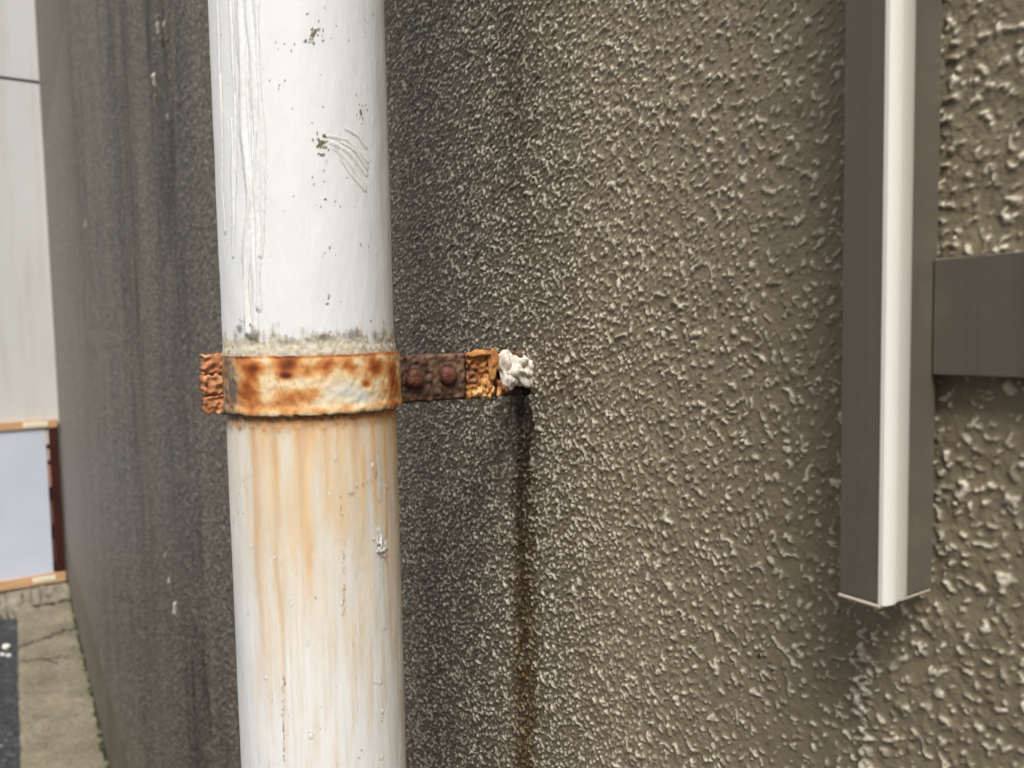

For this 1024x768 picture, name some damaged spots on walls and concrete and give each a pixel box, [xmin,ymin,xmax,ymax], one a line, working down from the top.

corrosion [225,407,400,594]